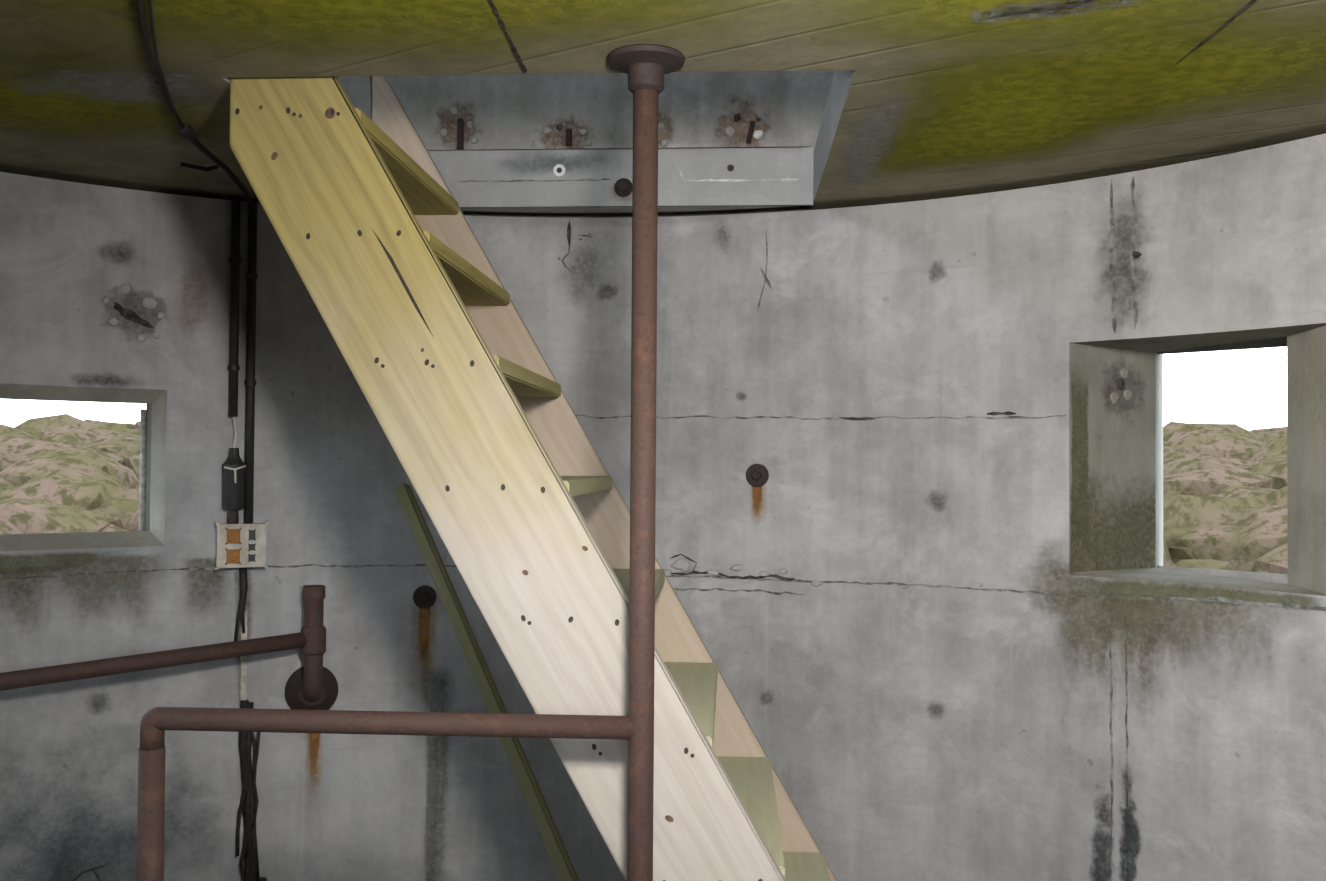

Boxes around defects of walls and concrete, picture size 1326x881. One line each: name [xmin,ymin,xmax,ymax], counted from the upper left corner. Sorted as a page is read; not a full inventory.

crack [976,0,1129,22]
crack [1175,0,1255,65]
damp [1107,218,1143,291]
corrosion [753,486,762,510]
crack [0,564,457,580]
corrosion [418,608,434,668]
crack [664,554,1326,881]
corrosion [308,733,319,776]
damp [426,736,448,881]
damp [1120,774,1140,881]